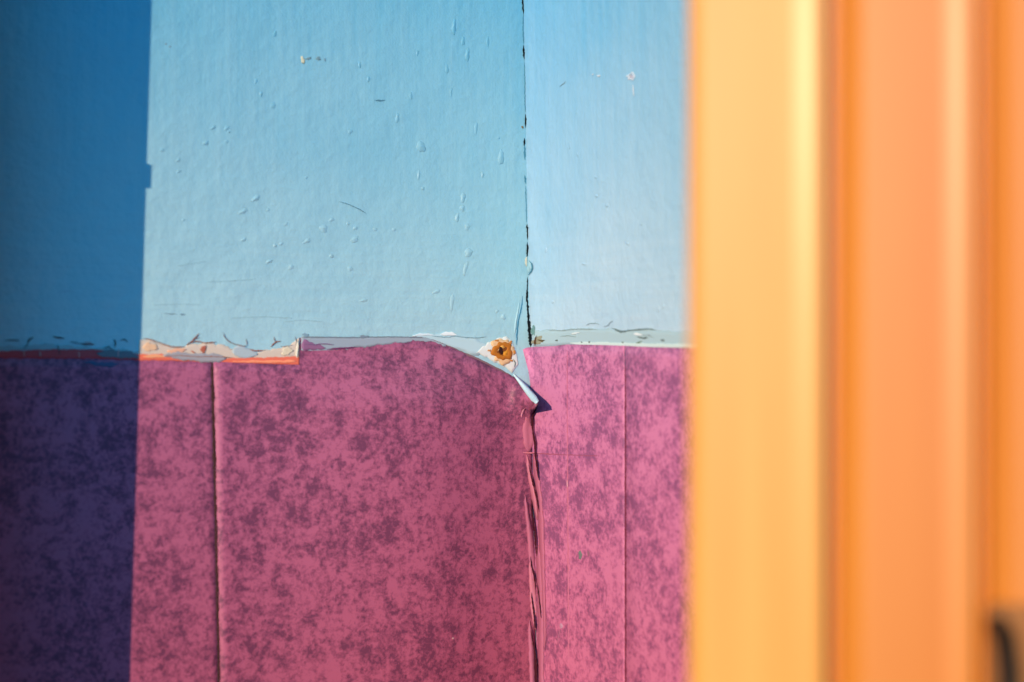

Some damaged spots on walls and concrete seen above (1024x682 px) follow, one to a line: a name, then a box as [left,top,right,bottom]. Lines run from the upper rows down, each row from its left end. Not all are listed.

crack [513,0,654,373]
flaking render [477,336,518,373]
corrosion [488,338,516,366]